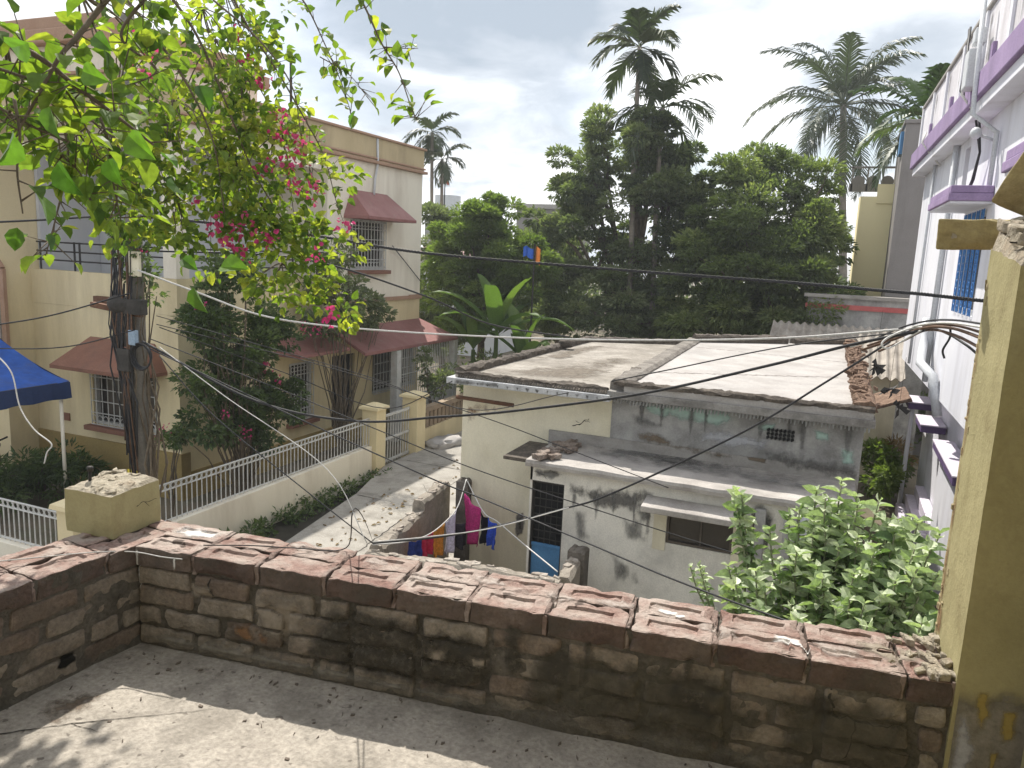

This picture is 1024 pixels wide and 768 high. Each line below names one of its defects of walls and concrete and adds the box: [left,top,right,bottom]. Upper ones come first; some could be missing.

leakage [572,487,650,537]
spalling [58,653,76,669]
peeling [948,693,1024,768]